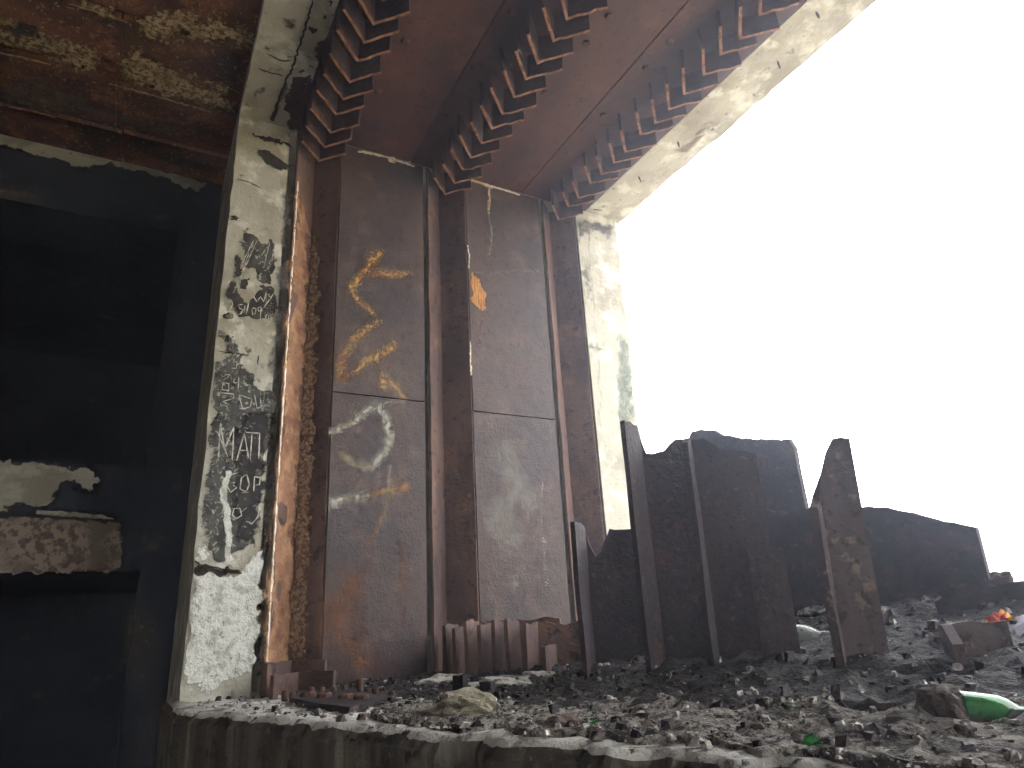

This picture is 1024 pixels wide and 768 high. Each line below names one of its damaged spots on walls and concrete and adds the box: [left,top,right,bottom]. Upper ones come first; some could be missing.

crack [259,0,313,121]
peeling [0,134,206,192]
rust [264,195,322,663]
peeling [0,459,123,576]
peeling [184,470,264,695]